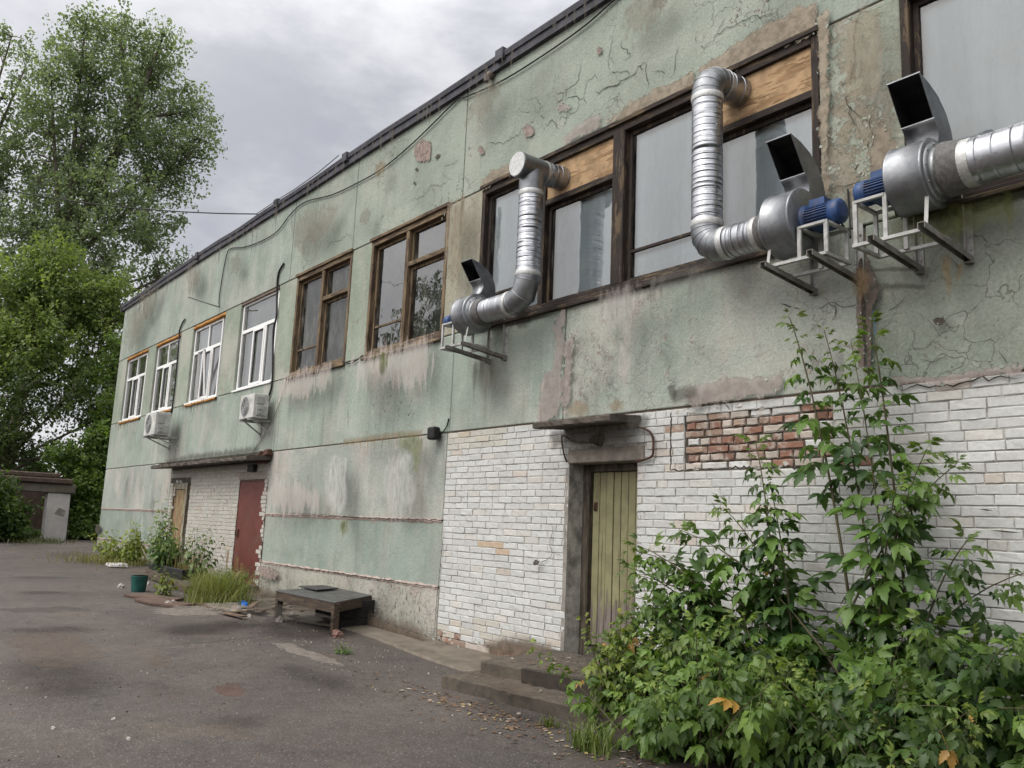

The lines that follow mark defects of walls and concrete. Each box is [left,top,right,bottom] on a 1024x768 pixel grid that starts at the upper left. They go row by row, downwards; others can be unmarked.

crack [488,10,777,144]
peeling [853,108,898,188]
peeling [537,309,608,422]
crack [899,353,1021,391]
flaking render [665,374,873,472]
damp [327,456,347,536]
damp [387,437,421,514]